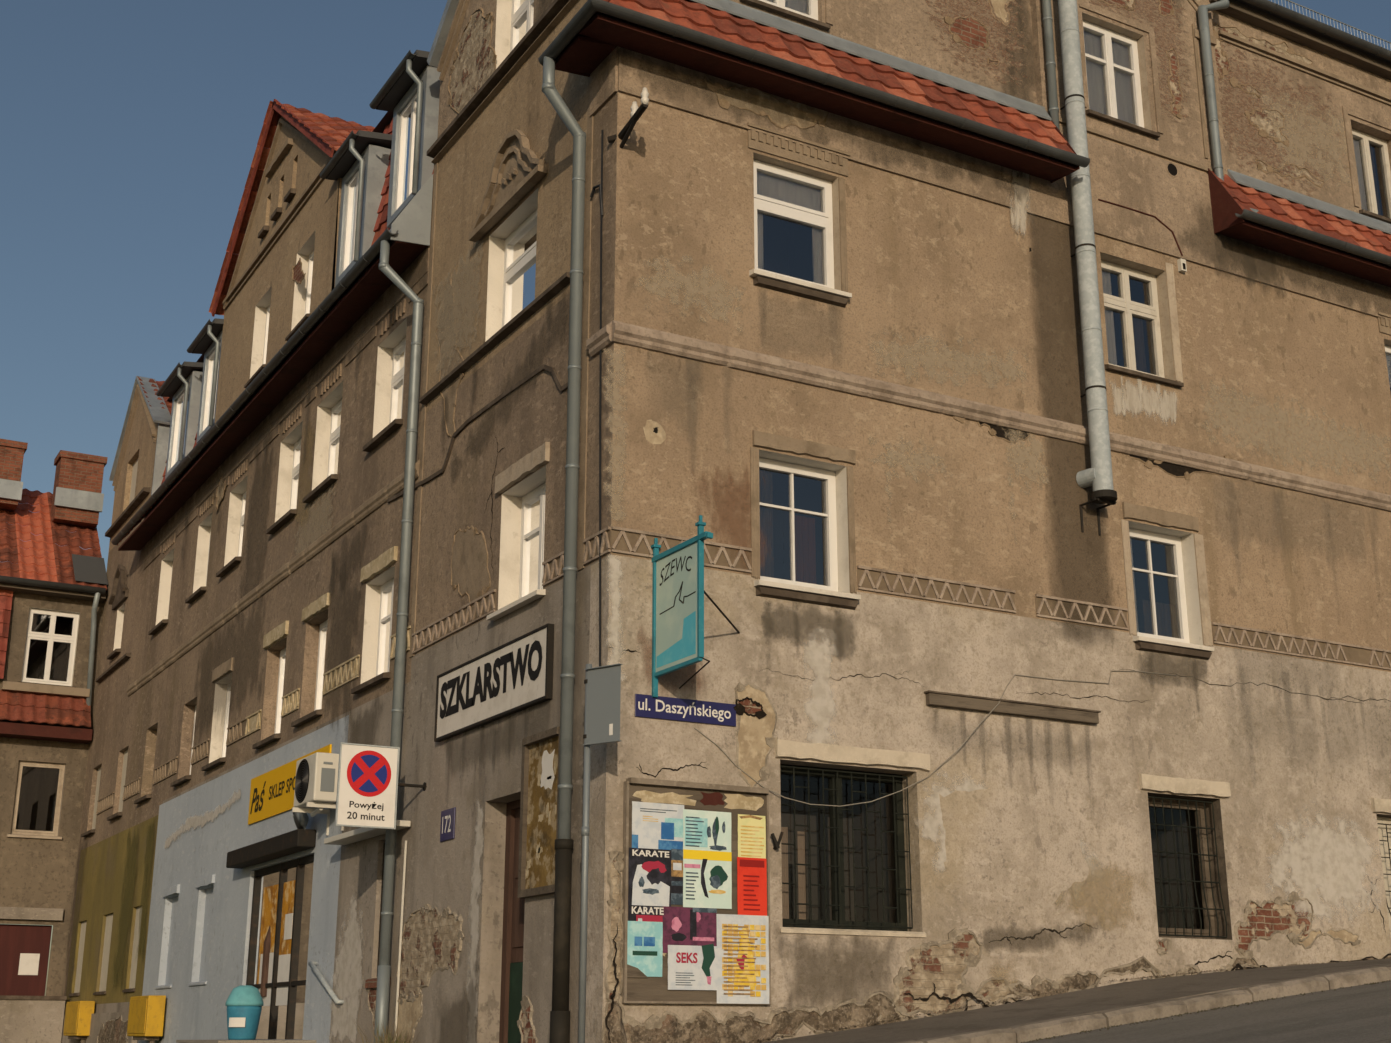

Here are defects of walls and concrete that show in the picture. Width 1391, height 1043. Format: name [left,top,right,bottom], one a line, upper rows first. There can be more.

spalling [944,0,1015,50]
crack [767,668,924,687]
peeling [733,682,778,787]
spalling [396,904,464,1003]
spalling [602,850,1391,1043]
crack [989,923,1098,945]
spalling [366,988,377,1030]